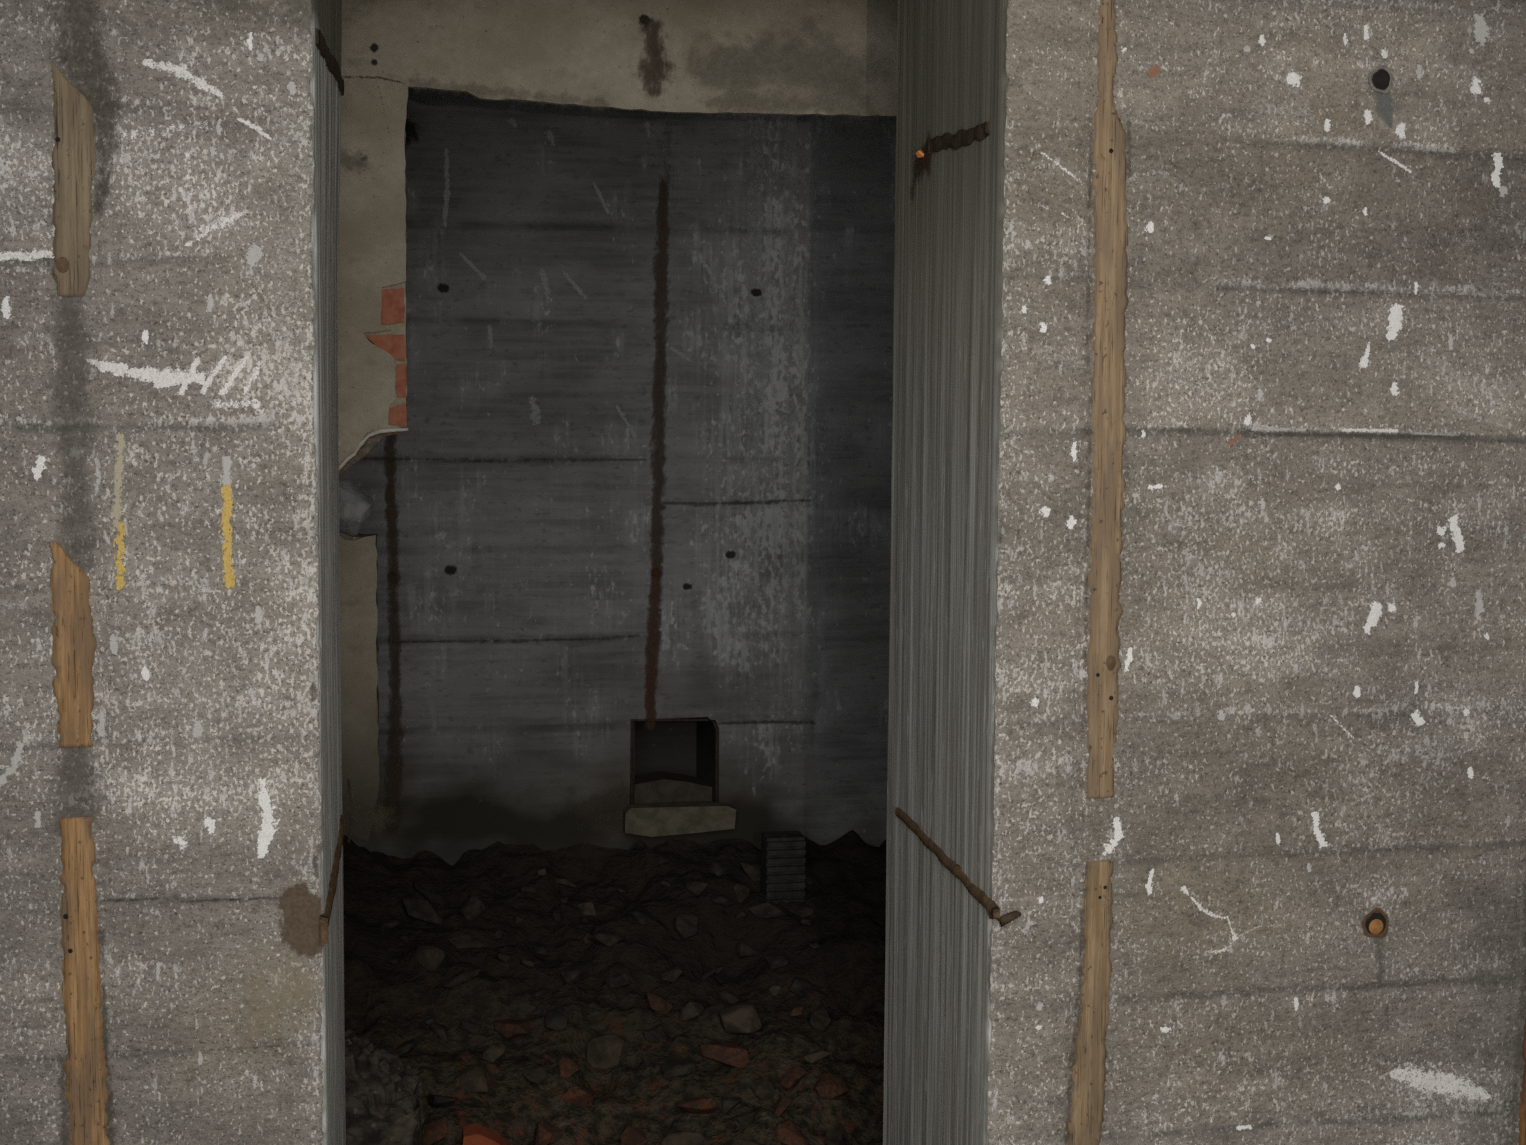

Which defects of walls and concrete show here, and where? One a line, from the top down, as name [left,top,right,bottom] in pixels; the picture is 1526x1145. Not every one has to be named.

corrosion [911,133,930,200]
leakage [110,432,126,529]
flaking render [338,282,408,536]
corrosion [645,181,669,729]
corrosion [384,434,404,832]
corrosion [280,883,324,956]